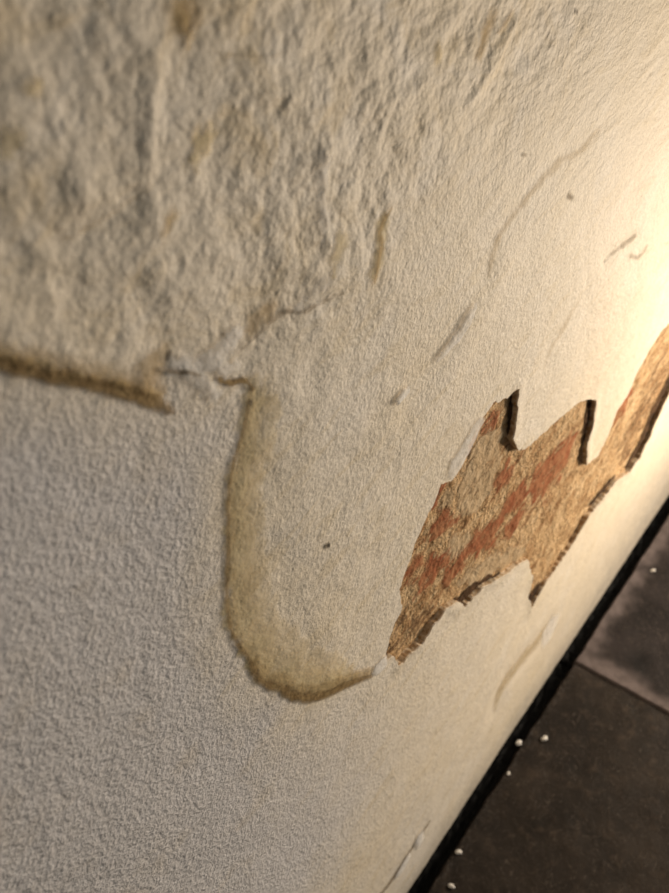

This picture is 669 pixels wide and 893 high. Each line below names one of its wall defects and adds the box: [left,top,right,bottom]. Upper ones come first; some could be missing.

damp [0,350,174,414]
damp [224,603,355,694]
crack [218,377,372,702]
spalling [373,324,669,675]